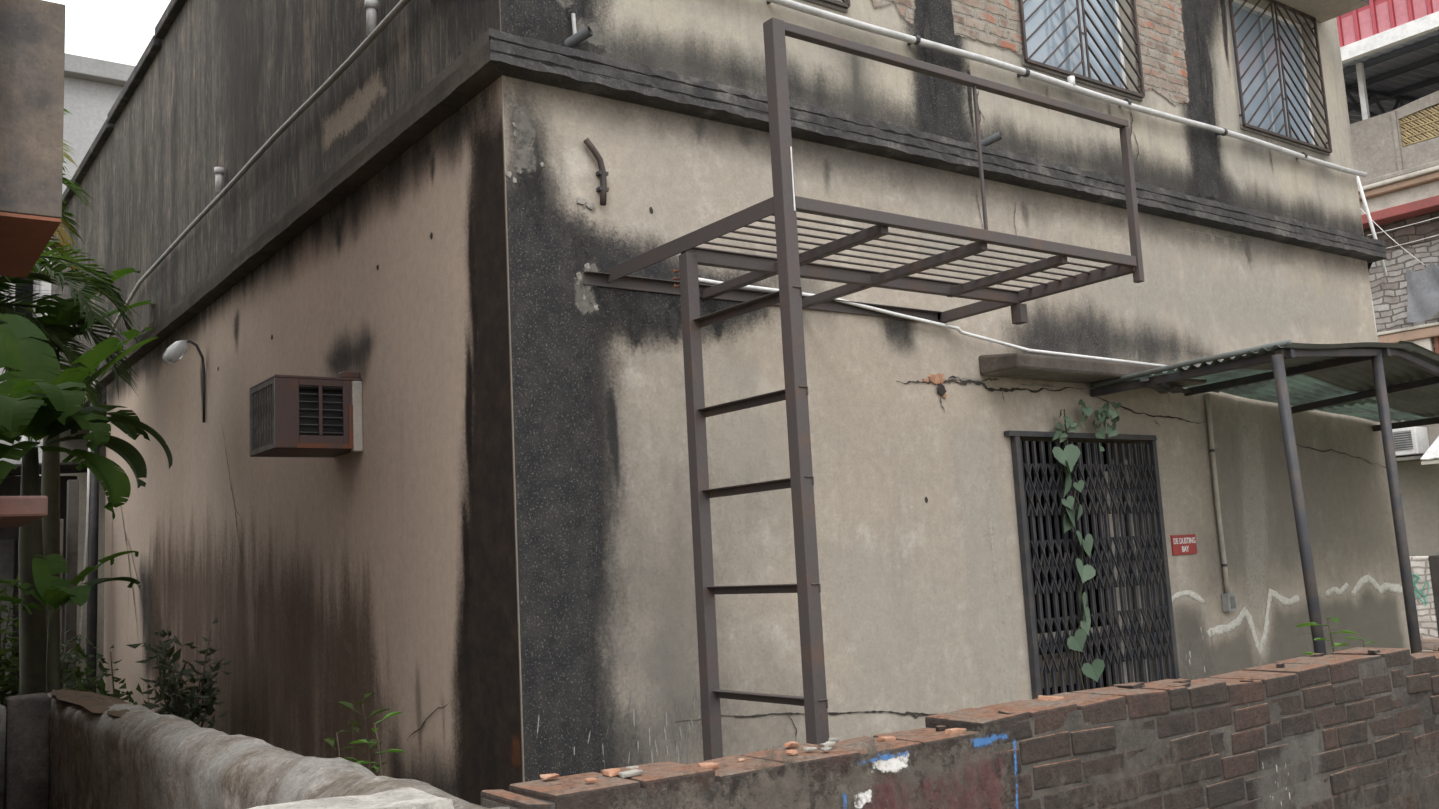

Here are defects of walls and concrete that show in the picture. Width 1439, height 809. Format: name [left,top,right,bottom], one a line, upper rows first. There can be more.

water stain [500,0,767,96]
spalling [951,0,1023,56]
spalling [1131,0,1189,105]
water stain [787,0,1364,236]
water stain [698,269,768,339]
water stain [105,89,704,805]
crack [896,376,1204,427]